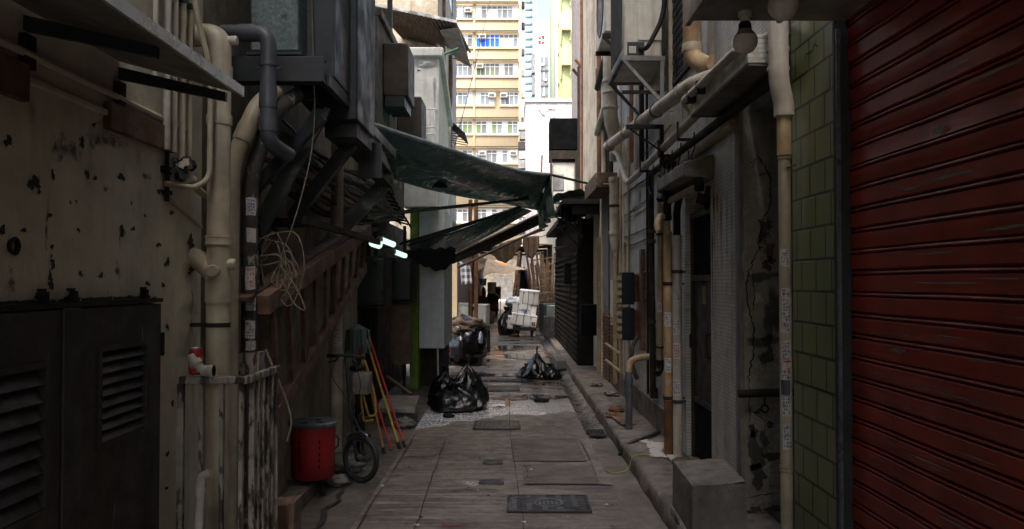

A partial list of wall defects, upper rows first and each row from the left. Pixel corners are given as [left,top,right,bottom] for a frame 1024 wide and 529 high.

spalling [28,169,55,194]
peeling [0,245,165,305]
crack [745,154,775,443]